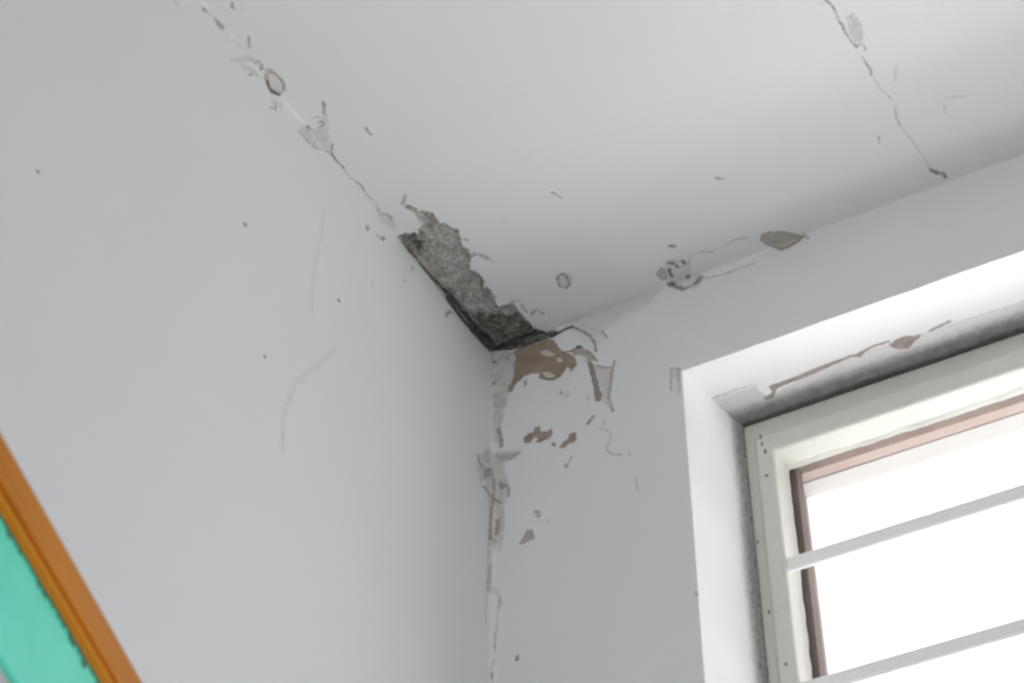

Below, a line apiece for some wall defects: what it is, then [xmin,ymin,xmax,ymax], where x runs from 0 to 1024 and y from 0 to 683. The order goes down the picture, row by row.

peeling [760,231,808,249]
peeling [657,260,703,291]
flaking render [366,195,615,412]
peeling [765,321,951,399]
water stain [739,320,1024,427]
peeling [524,426,577,468]
peeling [519,529,534,544]